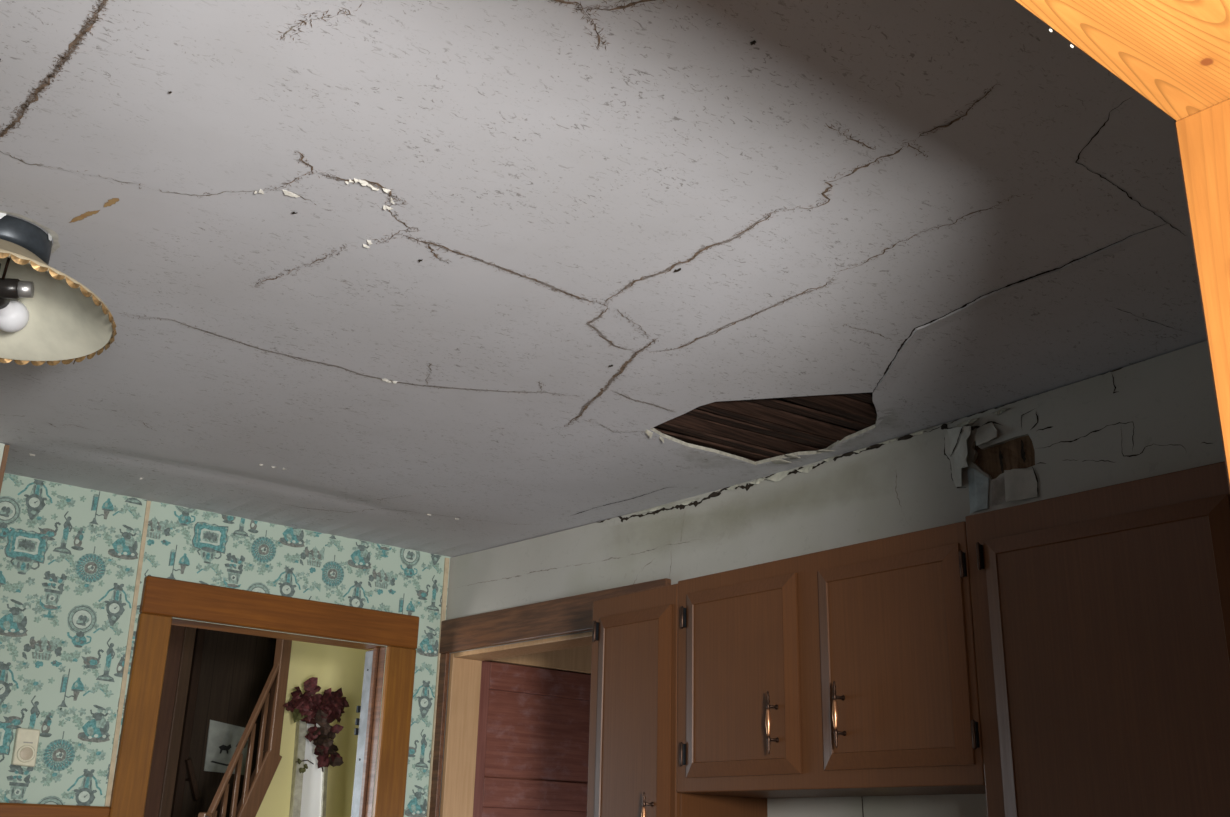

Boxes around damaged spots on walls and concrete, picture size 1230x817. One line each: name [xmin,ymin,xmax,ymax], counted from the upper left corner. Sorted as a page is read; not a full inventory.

crack [0,0,1034,433]
spalling [944,422,1039,514]